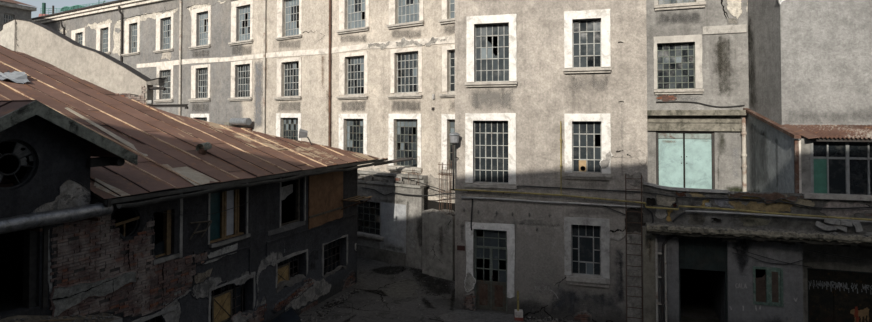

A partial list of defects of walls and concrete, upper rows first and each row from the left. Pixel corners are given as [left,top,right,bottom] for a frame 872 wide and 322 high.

flaking render [30,178,92,213]
peeling [726,191,872,227]
flaking render [48,214,284,322]
flaking render [284,277,332,312]
peeling [464,272,476,292]
flaking render [610,190,722,322]